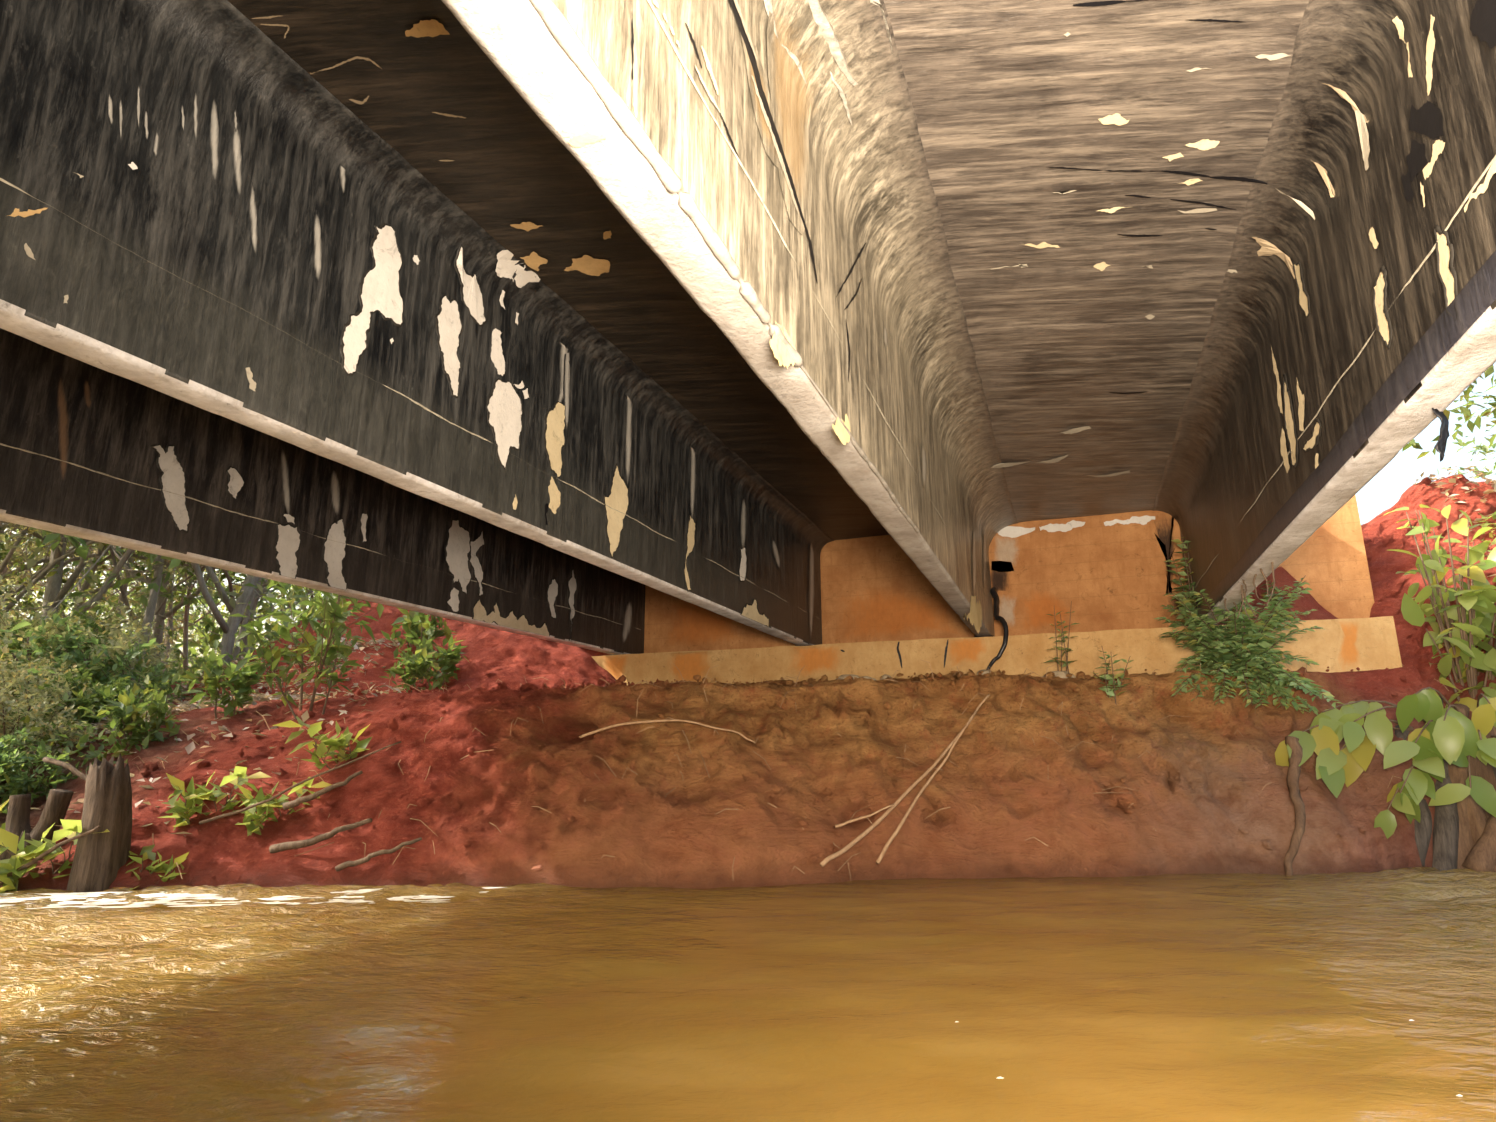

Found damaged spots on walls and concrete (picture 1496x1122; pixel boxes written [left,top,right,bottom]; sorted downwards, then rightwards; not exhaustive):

peeling [1322,83,1370,170]
peeling [1392,15,1445,207]
crack [685,0,866,382]
peeling [150,444,190,533]
peeling [340,223,419,376]
peeling [435,244,548,470]
peeling [544,401,566,525]
peeling [595,463,629,564]
peeling [1271,347,1321,473]
peeling [1369,227,1392,349]
peeling [1434,225,1458,319]
peeling [445,519,577,641]